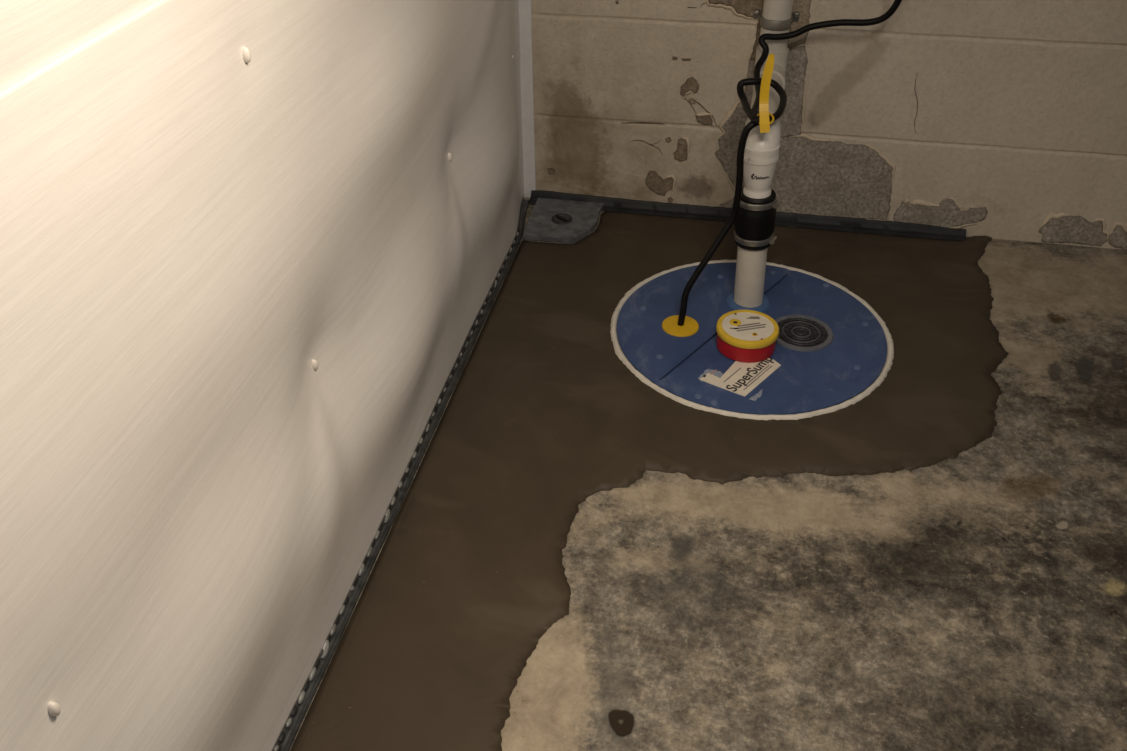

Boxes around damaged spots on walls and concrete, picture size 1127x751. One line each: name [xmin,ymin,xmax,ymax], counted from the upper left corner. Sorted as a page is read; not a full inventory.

spalling [680,0,764,208]
spalling [771,0,988,229]
spalling [665,137,691,162]
spalling [645,171,676,203]
spalling [1039,213,1127,250]
water stain [608,710,634,736]